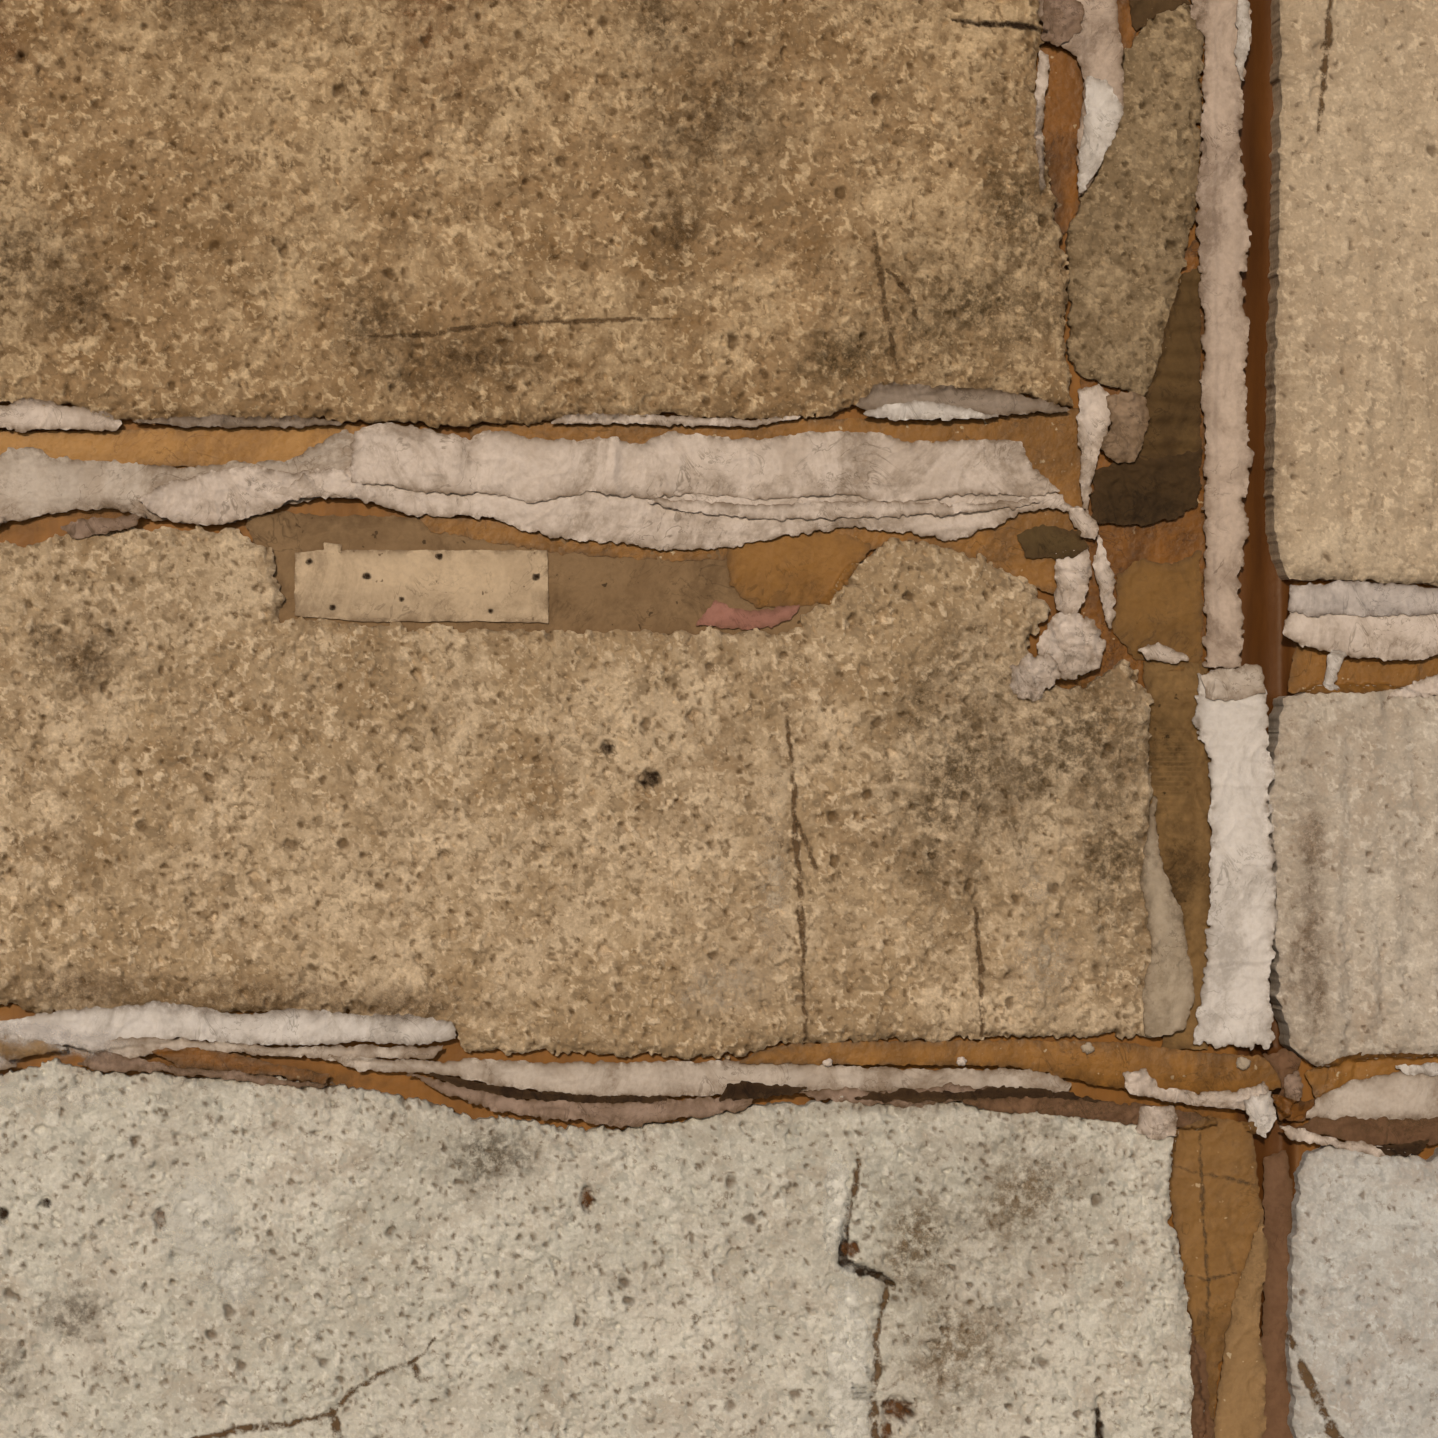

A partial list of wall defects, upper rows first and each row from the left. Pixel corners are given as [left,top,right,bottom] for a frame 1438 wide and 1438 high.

peeling [1034,0,1124,197]
crack [1317,0,1333,132]
peeling [0,382,1150,702]
peeling [1138,0,1278,1050]
peeling [1282,580,1438,691]
peeling [1387,674,1438,699]
crack [785,706,818,1040]
peeling [0,1001,1438,1157]
crack [192,1337,436,1438]
crack [838,1153,896,1438]